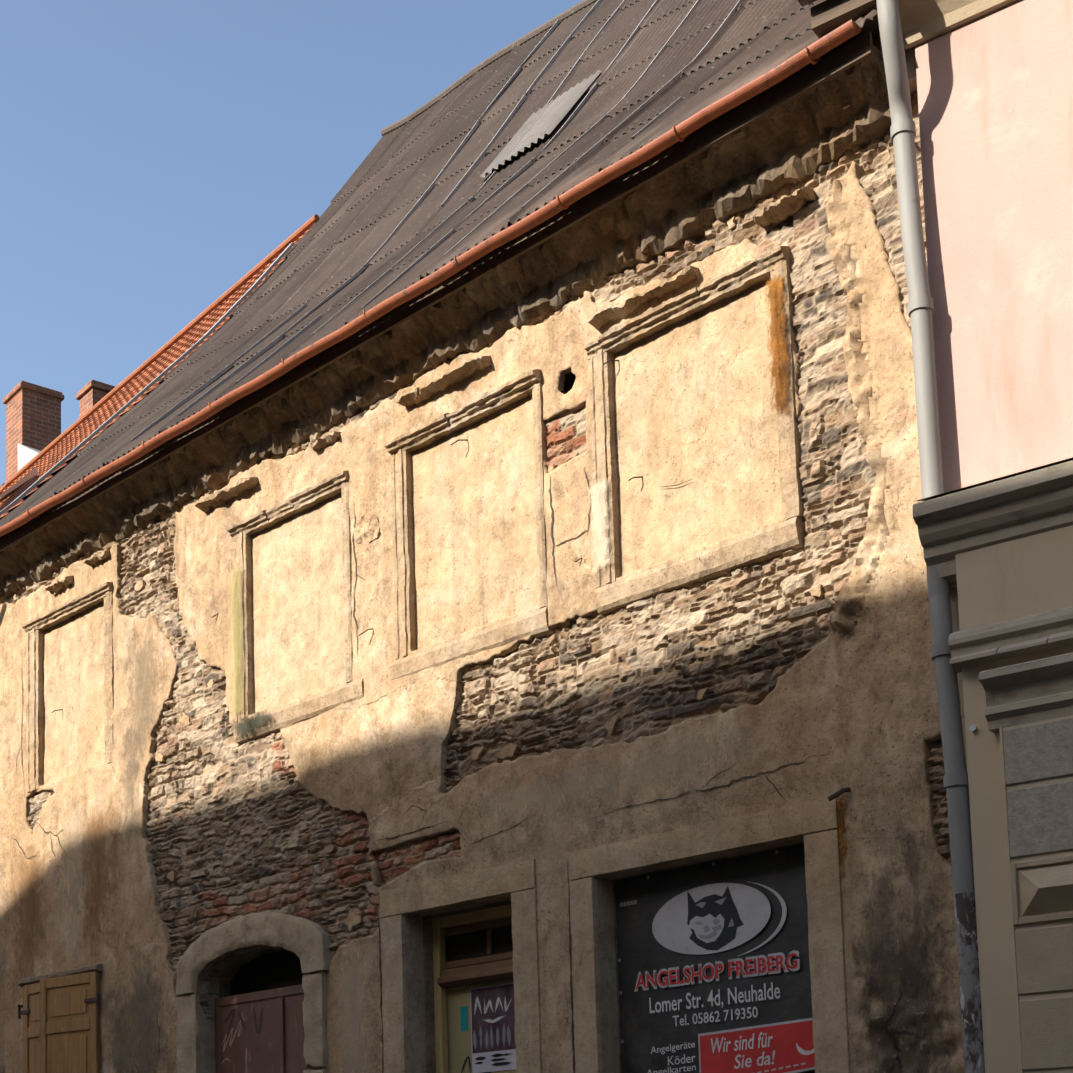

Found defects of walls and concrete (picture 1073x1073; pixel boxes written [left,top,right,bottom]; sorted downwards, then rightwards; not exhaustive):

flaking render [910,92,928,271]
flaking render [269,382,415,460]
flaking render [443,131,911,793]
flaking render [0,482,461,1018]
crack [593,755,822,818]